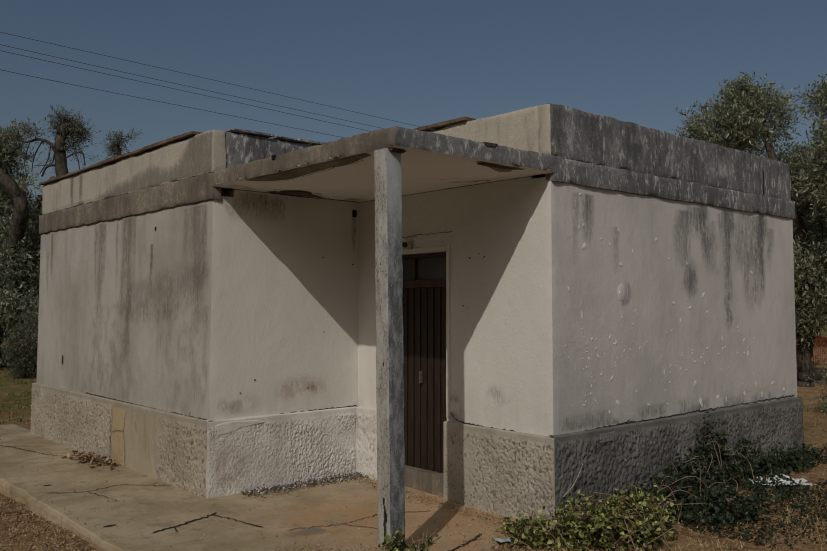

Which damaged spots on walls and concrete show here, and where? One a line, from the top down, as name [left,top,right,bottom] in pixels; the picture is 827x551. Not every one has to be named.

spalling [246,153,371,199]
spalling [477,162,524,172]